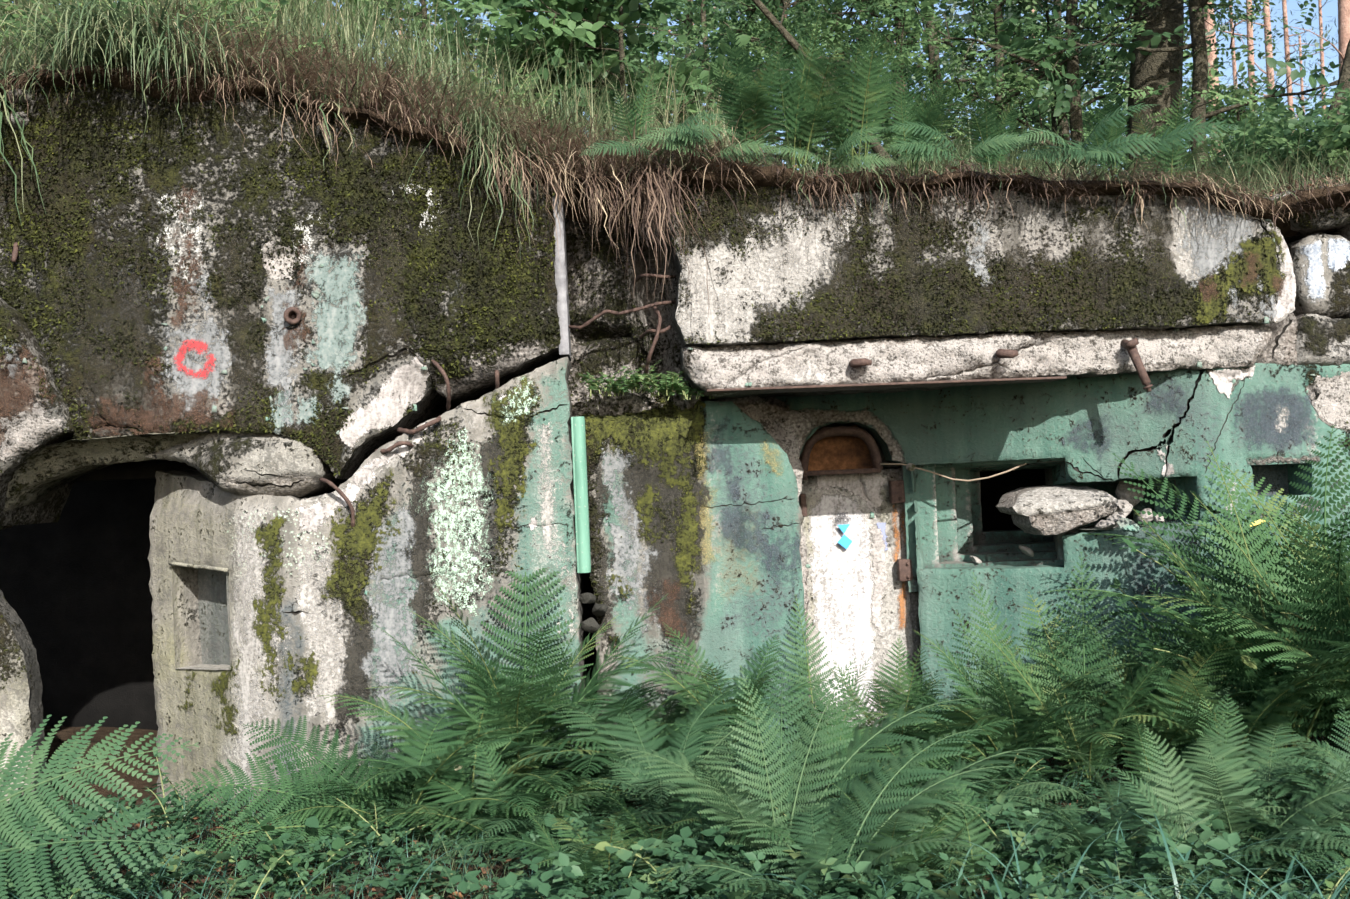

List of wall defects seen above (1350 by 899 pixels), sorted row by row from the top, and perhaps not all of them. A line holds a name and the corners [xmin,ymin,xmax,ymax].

rust [283,244,310,350]
crack [349,345,476,386]
crack [466,404,566,422]
spalling [680,219,1350,727]
crack [1066,372,1204,480]
water stain [590,442,711,663]
rust [892,504,906,563]
rust [898,582,906,628]